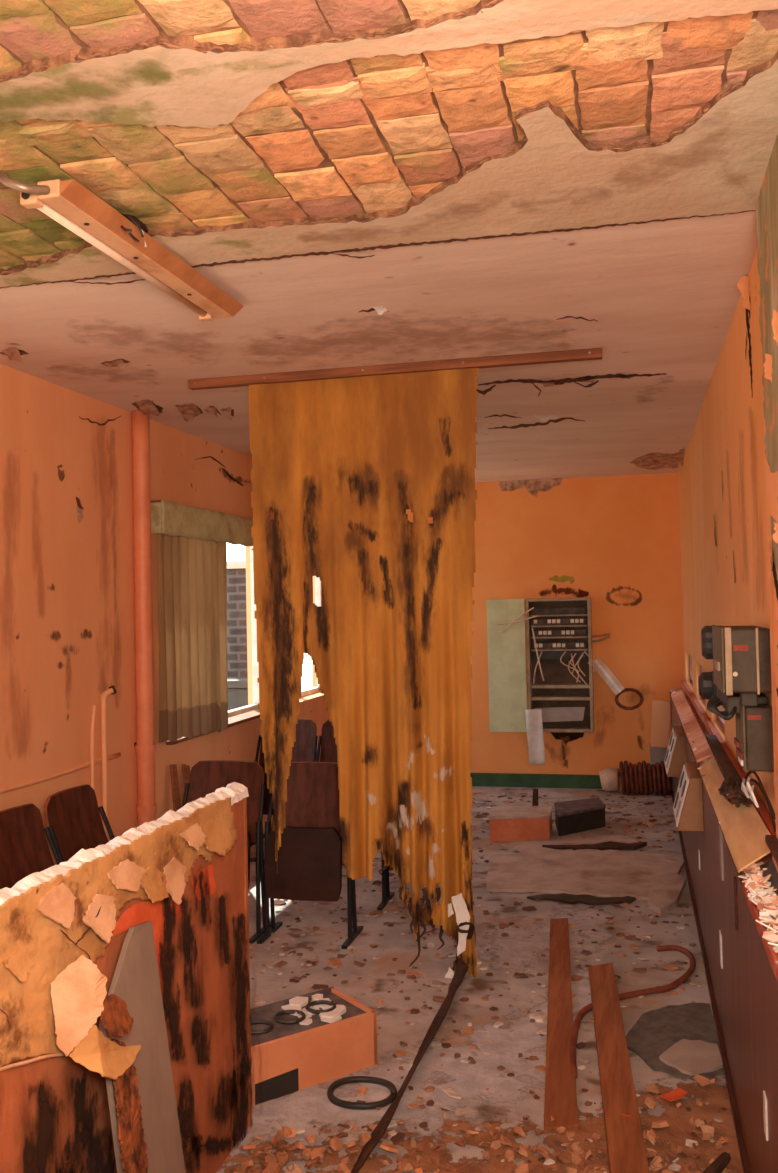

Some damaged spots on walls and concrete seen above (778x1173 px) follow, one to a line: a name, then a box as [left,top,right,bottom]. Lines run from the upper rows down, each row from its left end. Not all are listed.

flaking render [0,0,778,275]
crack [191,210,756,268]
crack [0,272,145,289]
peeling [755,134,778,473]
peeling [0,347,29,361]
peeling [132,400,234,421]
crack [476,373,667,429]
crack [195,456,244,486]
peeling [629,448,685,470]
peeling [770,515,778,600]
peeling [0,797,237,1173]
water stain [23,1074,114,1173]